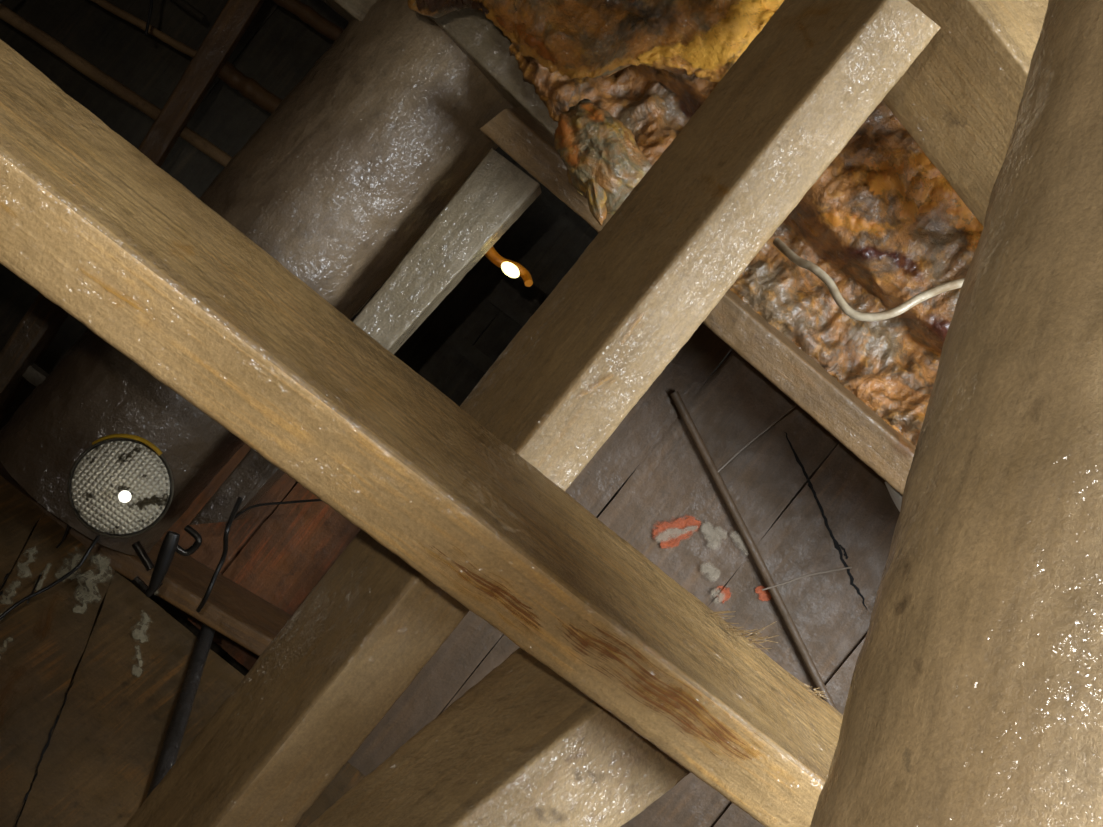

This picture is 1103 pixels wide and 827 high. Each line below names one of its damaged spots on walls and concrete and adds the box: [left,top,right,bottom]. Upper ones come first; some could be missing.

crack [785,432,867,609]
efflorescence [0,547,112,620]
corrosion [755,586,772,601]
water stain [132,613,151,677]